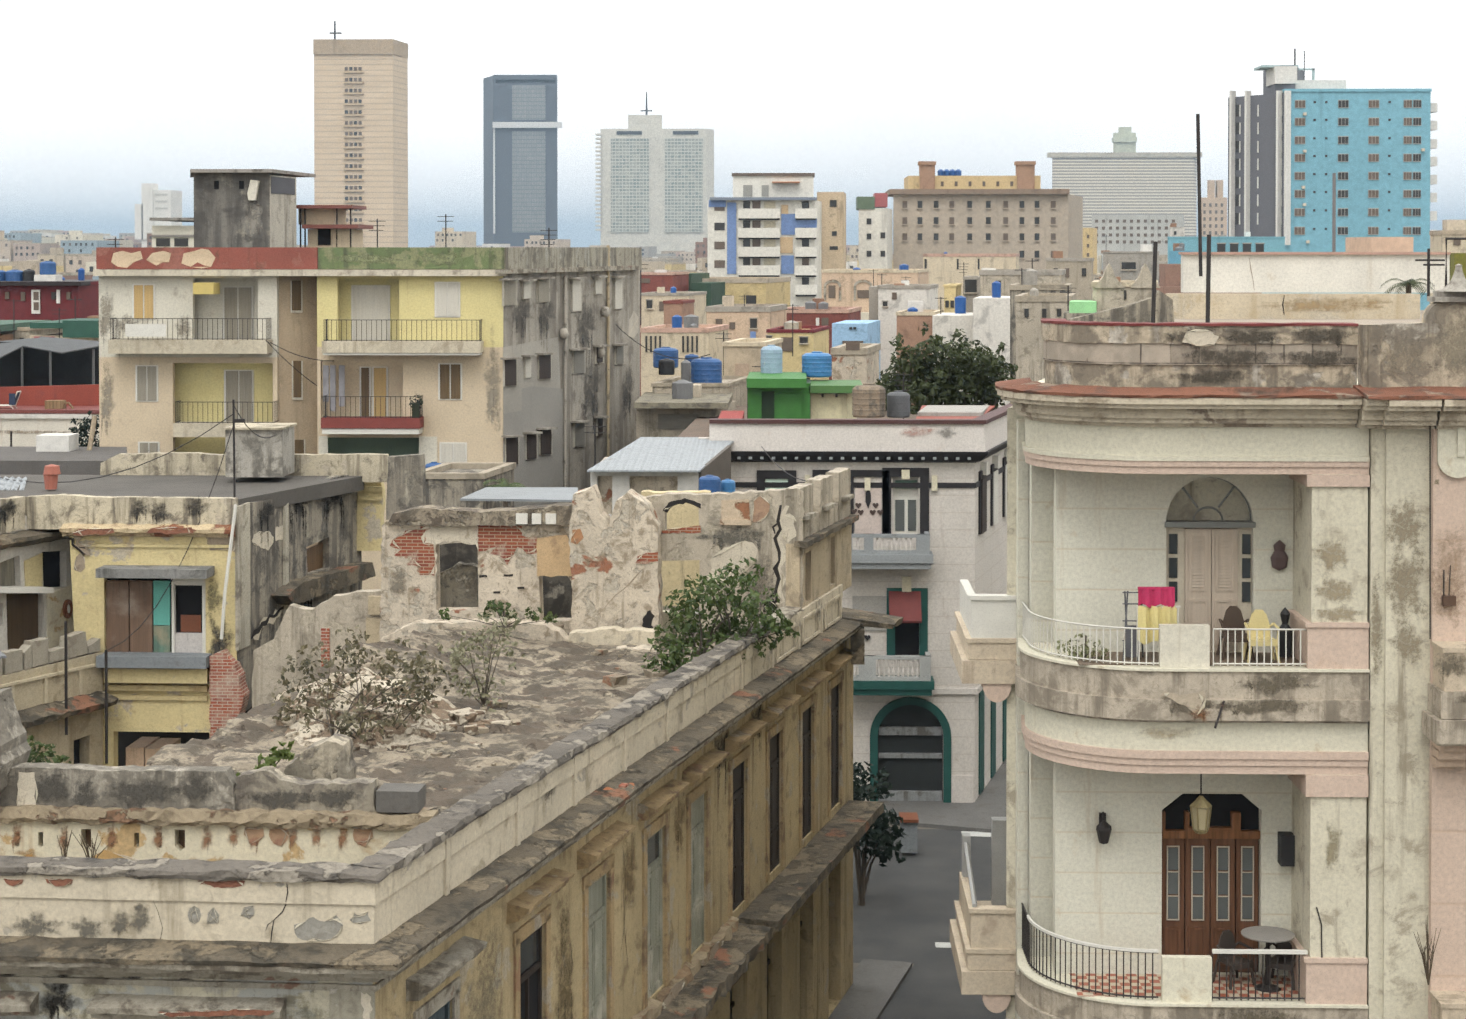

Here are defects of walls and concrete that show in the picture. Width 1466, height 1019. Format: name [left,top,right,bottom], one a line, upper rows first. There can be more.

peeling [111,249,215,269]
water stain [515,300,553,337]
water stain [578,309,600,425]
spalling [662,498,701,534]
spalling [752,496,797,543]
flaking render [390,525,537,594]
spalling [706,541,758,589]
water stain [1317,504,1463,669]
spalling [642,610,654,628]
water stain [1437,655,1466,678]
water stain [16,904,148,938]
water stain [42,975,75,1019]